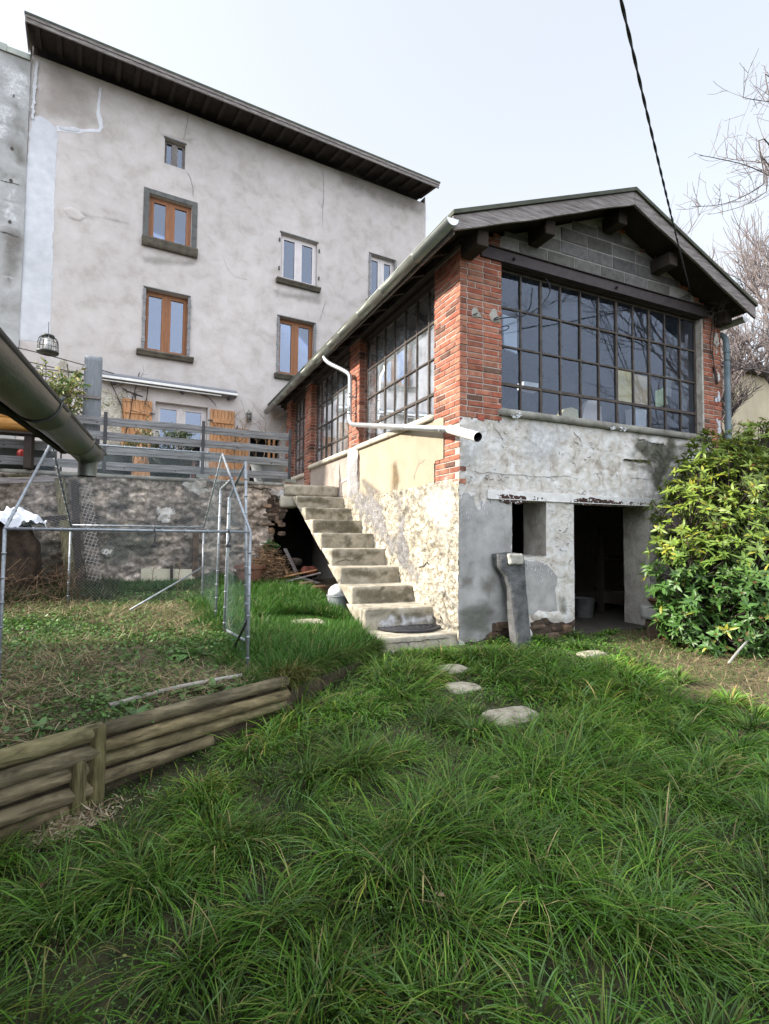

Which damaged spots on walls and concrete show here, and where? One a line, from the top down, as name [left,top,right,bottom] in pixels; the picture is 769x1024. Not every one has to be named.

crack [57,87,103,134]
leakage [635,433,687,488]
peeling [498,494,547,505]
peeling [570,497,646,507]
flaking render [530,618,575,639]